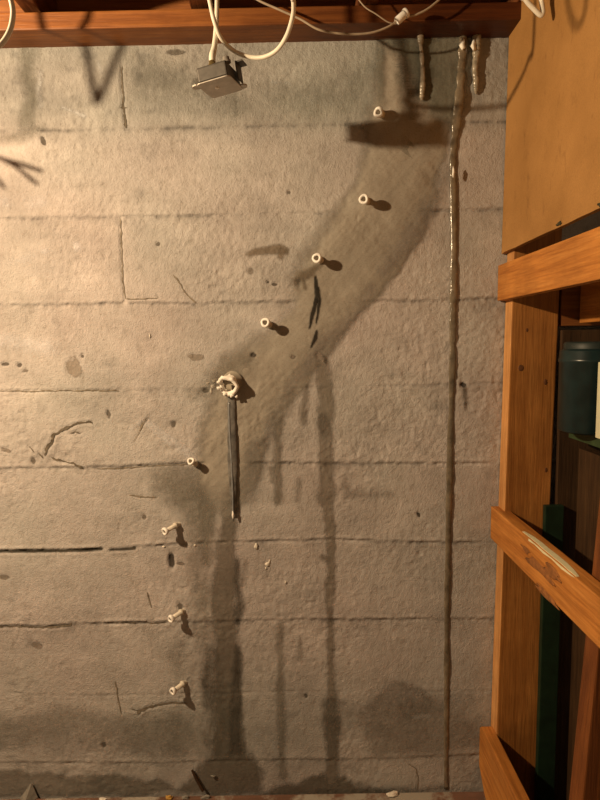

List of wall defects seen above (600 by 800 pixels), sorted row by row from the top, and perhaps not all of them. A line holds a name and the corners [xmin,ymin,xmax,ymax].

leakage [247,244,289,259]
leakage [212,359,248,379]
crack [30,421,188,469]
leakage [270,359,385,795]
crack [115,682,188,715]